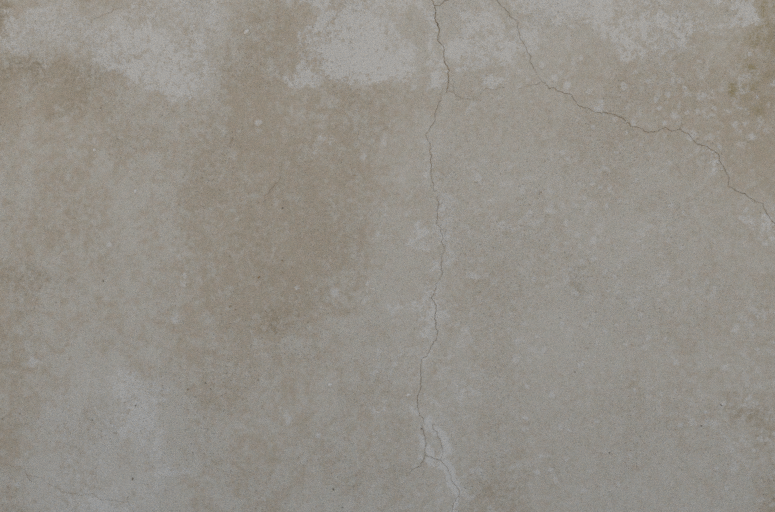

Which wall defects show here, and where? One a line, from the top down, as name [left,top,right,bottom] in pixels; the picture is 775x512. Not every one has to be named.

crack [410,0,775,509]